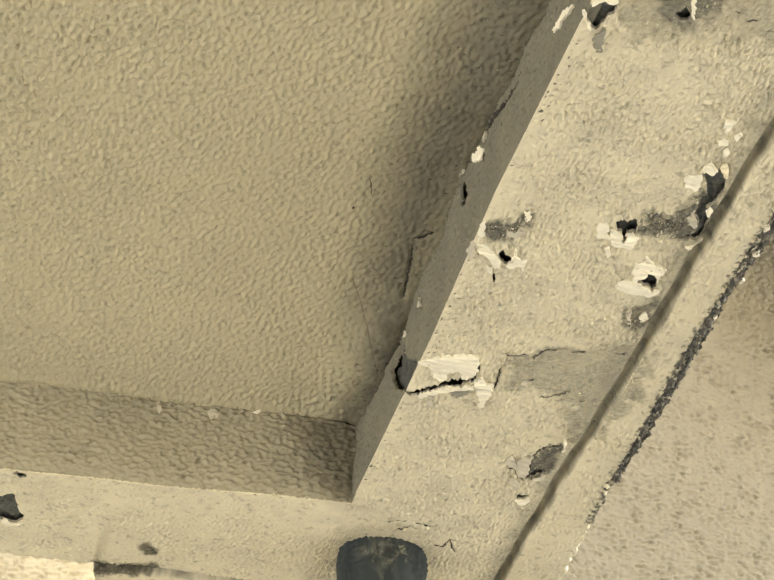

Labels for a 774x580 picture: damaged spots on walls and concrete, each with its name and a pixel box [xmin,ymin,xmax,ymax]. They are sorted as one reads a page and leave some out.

spalling [552,0,619,53]
spalling [664,0,720,24]
spalling [597,119,743,258]
spalling [466,210,534,280]
peeling [396,349,502,410]
peeling [507,347,646,434]
spalling [609,212,774,483]
spalling [505,439,567,506]
spalling [0,493,23,526]